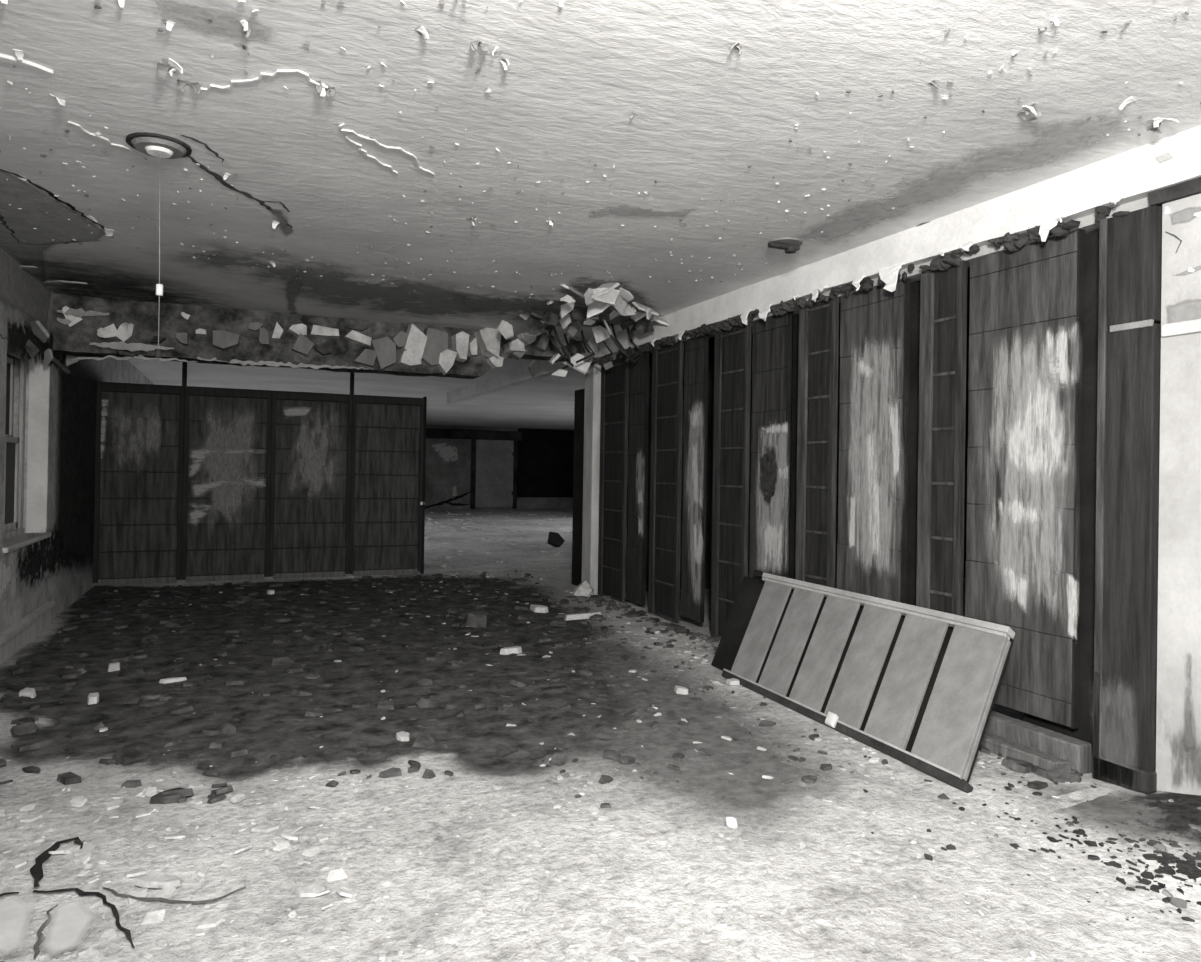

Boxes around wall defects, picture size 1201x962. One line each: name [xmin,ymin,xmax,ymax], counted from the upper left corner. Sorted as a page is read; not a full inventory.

peeling [235,20,252,55]
peeling [471,40,509,70]
peeling [157,58,201,95]
peeling [315,80,335,97]
peeling [1147,118,1179,134]
crack [180,135,293,234]
peeling [806,97,1136,241]
peeling [1165,206,1201,224]
peeling [0,169,1130,376]
peeling [1167,300,1201,323]
crack [0,837,246,962]